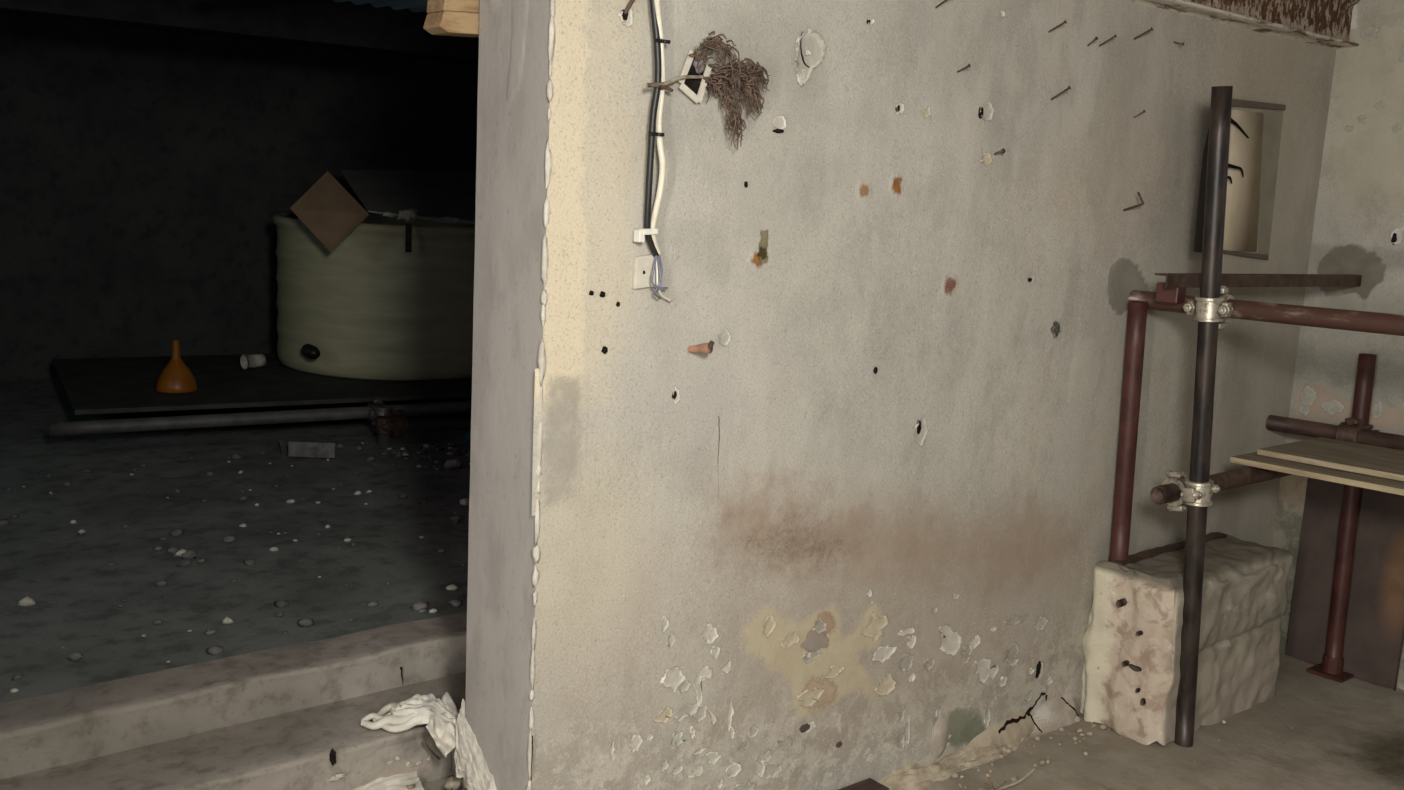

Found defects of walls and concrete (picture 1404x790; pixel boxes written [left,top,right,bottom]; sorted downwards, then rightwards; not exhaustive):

spalling [618,9,633,27]
spalling [794,28,826,87]
spalling [772,116,787,133]
spalling [978,102,994,121]
spalling [525,0,555,790]
spalling [915,415,928,446]
flaking render [1289,377,1354,425]
flaking render [1369,397,1404,435]
damp [673,438,1102,620]
flaking render [595,590,1066,790]
crack [998,692,1079,734]
flaking render [346,736,451,790]